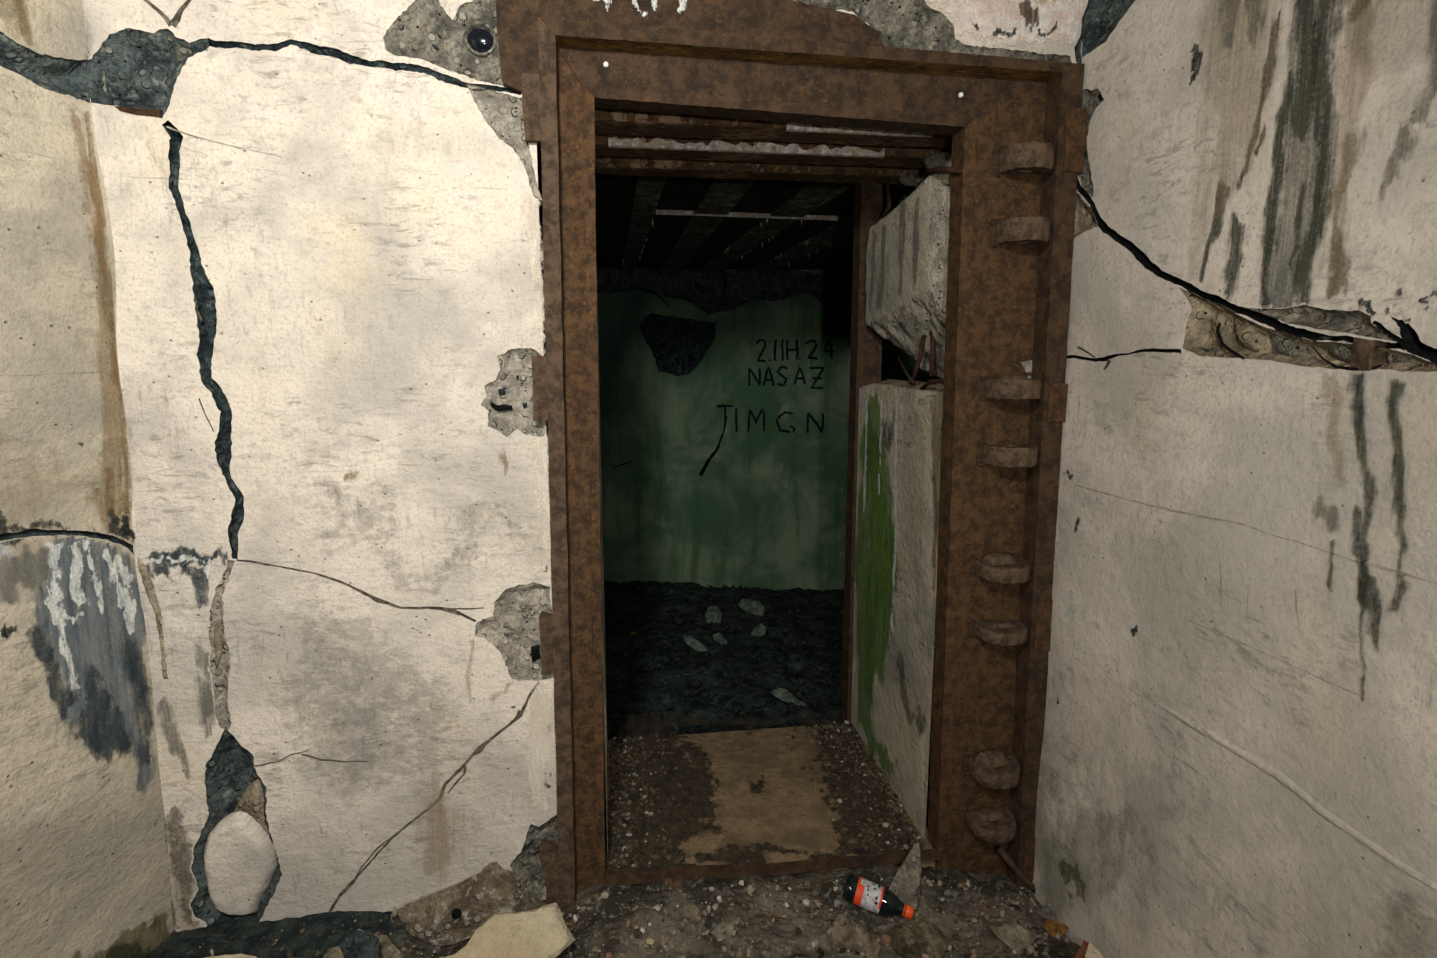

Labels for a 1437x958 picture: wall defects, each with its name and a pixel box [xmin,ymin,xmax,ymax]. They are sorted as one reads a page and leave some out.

crack [144,0,520,95]
spalling [383,0,543,202]
spalling [792,0,1135,63]
rust [1019,0,1039,31]
water stain [1199,0,1368,308]
crack [162,123,484,622]
spalling [481,348,546,437]
crack [1067,177,1437,371]
crack [0,528,134,555]
water stain [1316,372,1407,700]
water stain [0,509,235,791]
flaking render [190,726,282,926]